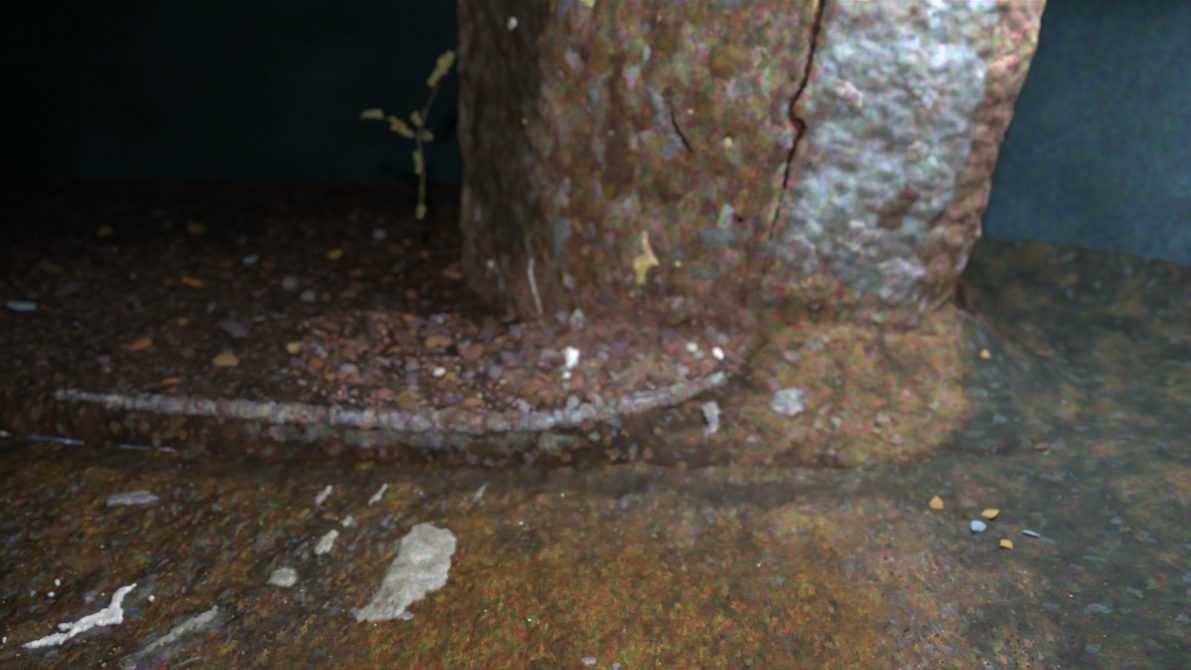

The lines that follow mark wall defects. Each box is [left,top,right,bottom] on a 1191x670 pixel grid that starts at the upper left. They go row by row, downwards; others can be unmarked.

crack [758,0,825,290]